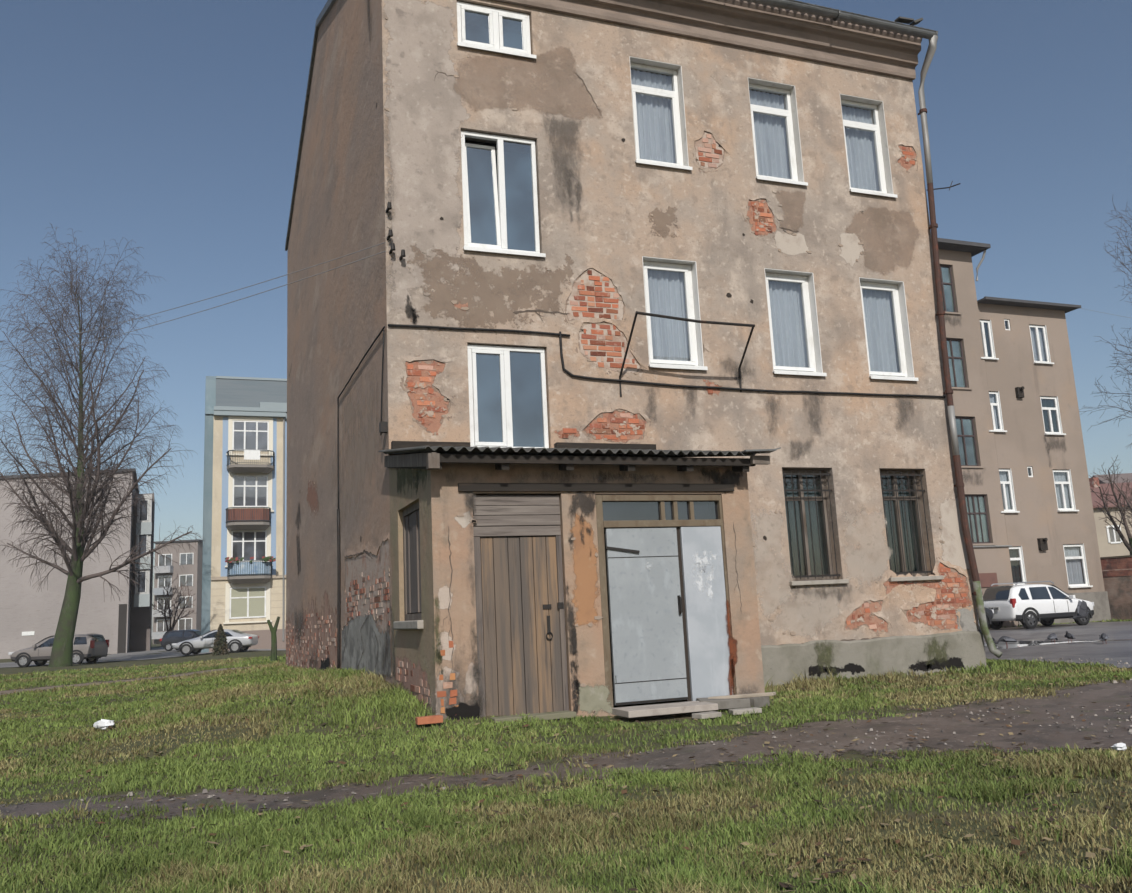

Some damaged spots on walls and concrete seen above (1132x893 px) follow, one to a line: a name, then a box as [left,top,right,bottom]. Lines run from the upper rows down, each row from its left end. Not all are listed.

flaking render [376,0,649,380]
water stain [550,120,580,205]
spalling [688,124,731,176]
spalling [740,190,797,252]
spalling [892,142,920,174]
spalling [397,350,457,440]
spalling [554,401,653,444]
spalling [285,531,392,671]
spalling [437,585,453,610]
flaking render [570,514,603,627]
spalling [840,557,977,639]
flaking render [391,631,480,720]